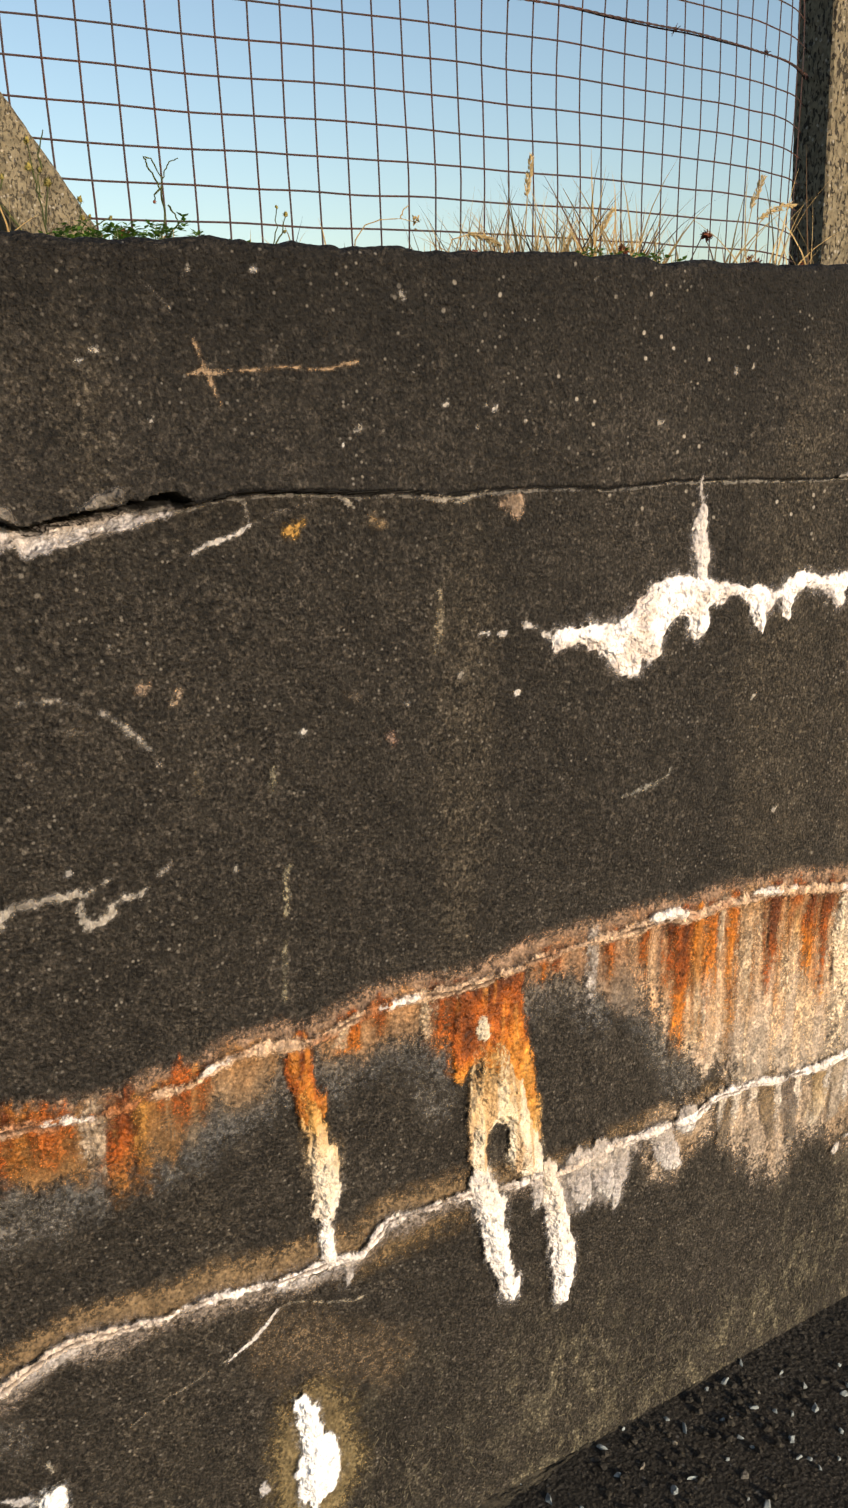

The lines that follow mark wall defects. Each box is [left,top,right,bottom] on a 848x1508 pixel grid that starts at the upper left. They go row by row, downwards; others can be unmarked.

spalling [0,487,181,558]
crack [114,472,848,555]
damp [479,476,848,678]
crack [100,710,161,768]
corrosion [0,1037,295,1219]
damp [283,1030,342,1266]
corrosion [312,979,466,1103]
crack [0,862,848,1141]
crack [0,1043,848,1428]
damp [376,971,576,1304]
corrosion [521,873,848,1098]
damp [249,1309,413,1508]